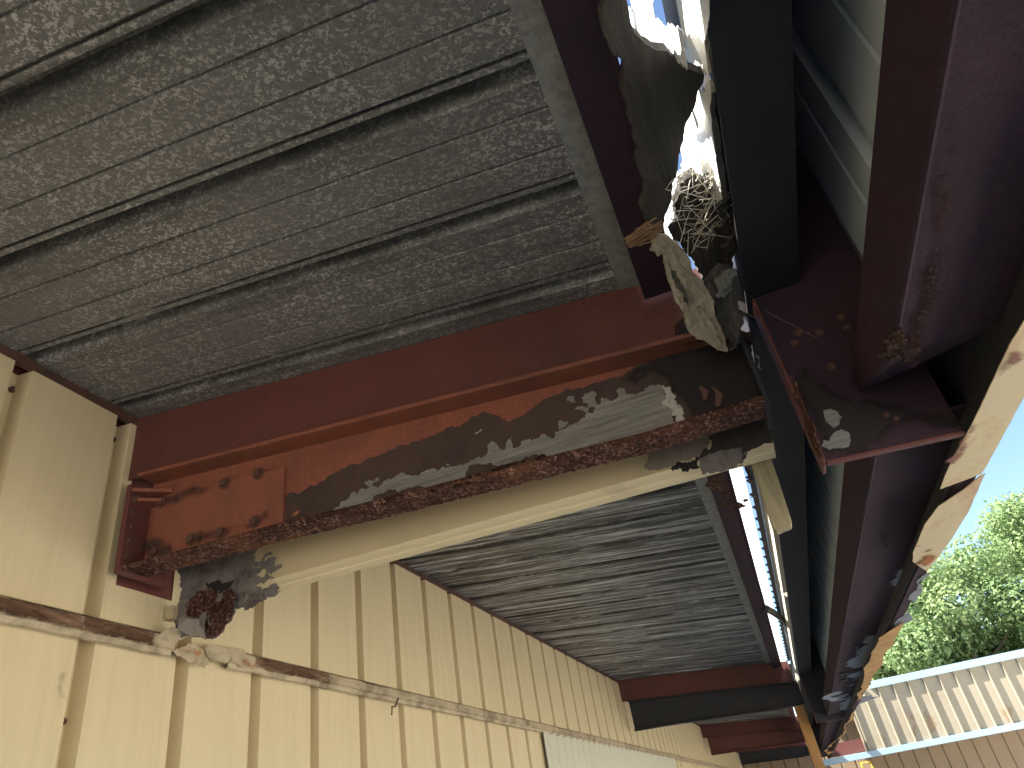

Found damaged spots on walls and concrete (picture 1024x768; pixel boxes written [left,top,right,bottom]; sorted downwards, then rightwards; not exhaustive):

peeling [285,361,693,521]
corrosion [644,418,773,482]
peeling [821,409,851,450]
corrosion [704,475,758,511]
corrosion [199,588,236,630]
peeling [891,573,930,630]
peeling [822,634,880,710]